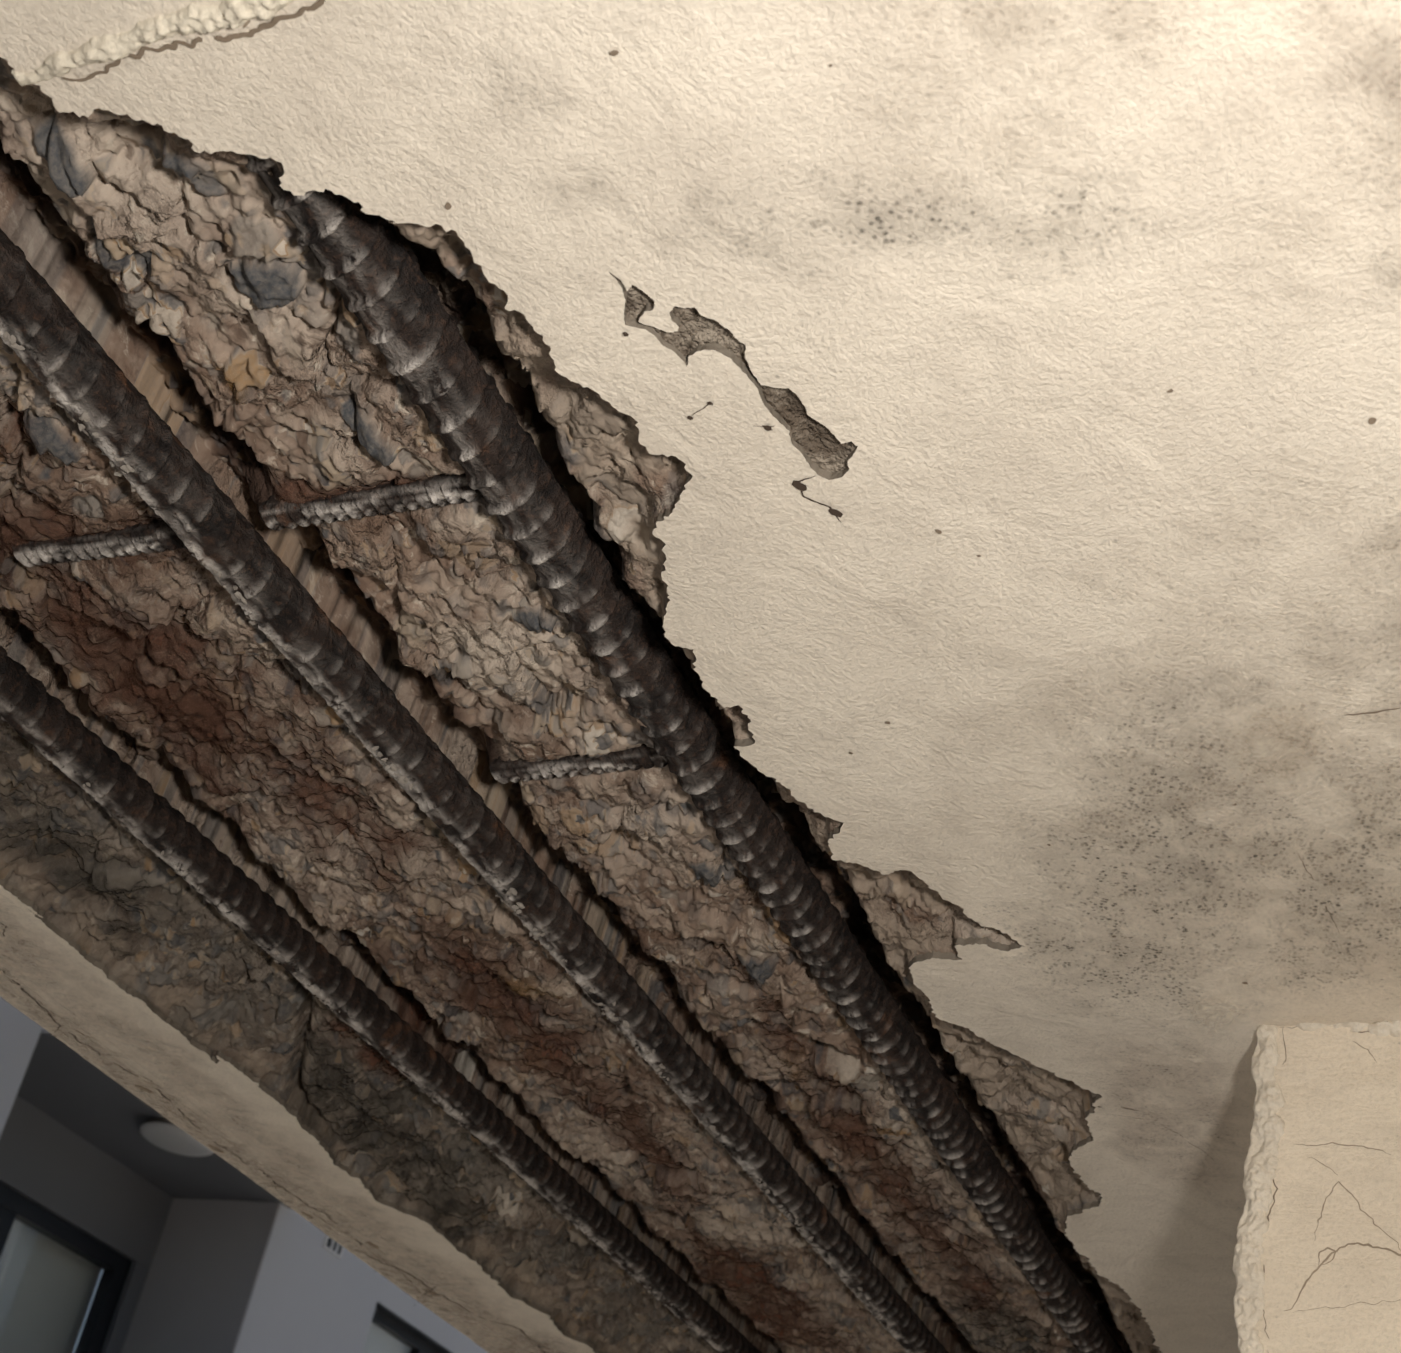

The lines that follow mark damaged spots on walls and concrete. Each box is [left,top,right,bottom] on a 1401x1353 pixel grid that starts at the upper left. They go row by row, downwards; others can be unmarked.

leakage [847,201,911,243]
corrosion [41,565,378,835]
spalling [0,57,1161,1353]
corrosion [372,827,416,881]
mould [1060,769,1227,997]
leakage [1286,818,1401,953]
corrosion [385,973,432,1035]
corrosion [445,949,849,1353]
corrosion [810,1095,999,1313]
crack [1263,1142,1401,1338]